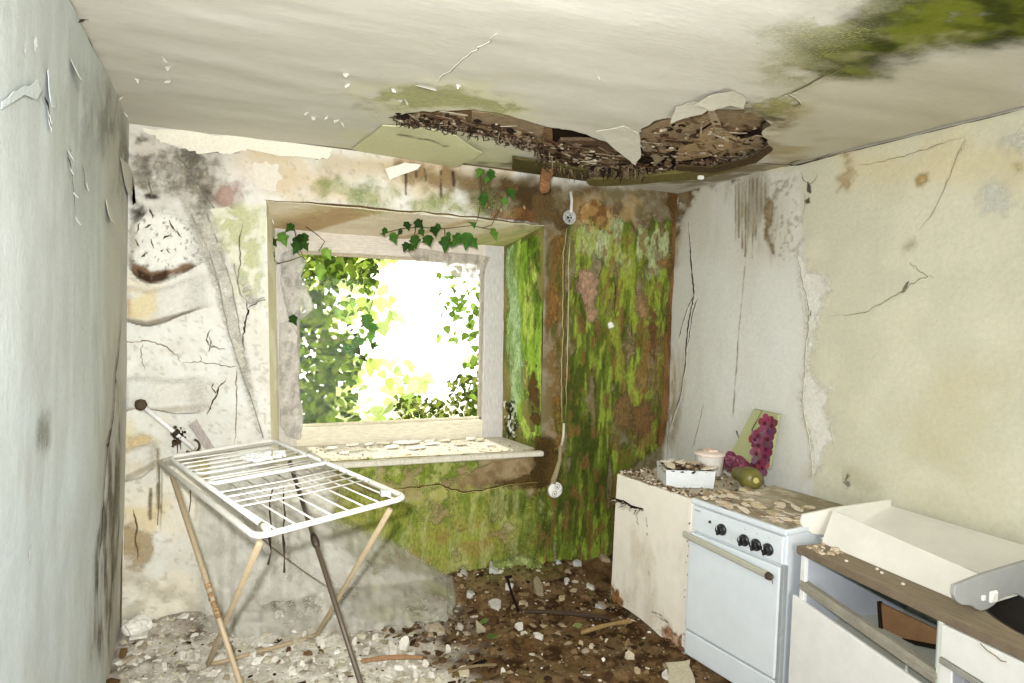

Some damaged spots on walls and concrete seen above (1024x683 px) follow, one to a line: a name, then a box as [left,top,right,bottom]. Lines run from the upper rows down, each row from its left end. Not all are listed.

peeling [1,69,56,109]
leakage [380,86,519,113]
peeling [120,157,136,205]
leakage [180,149,211,215]
peeling [352,125,481,180]
crack [762,109,1022,233]
leakage [735,196,774,254]
crack [807,263,934,323]
crack [662,222,704,452]
peeling [798,256,833,476]
crack [97,299,266,596]
leakage [503,370,560,487]